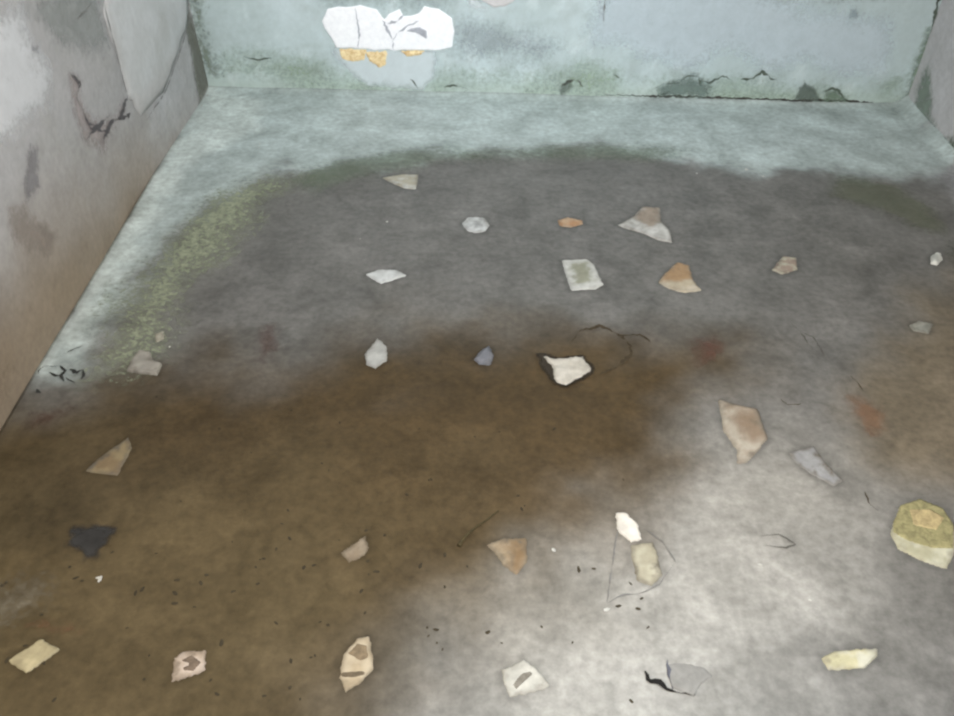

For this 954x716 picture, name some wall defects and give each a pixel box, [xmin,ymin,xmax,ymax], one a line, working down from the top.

flaking render [322,5,454,68]
crack [71,73,130,142]
water stain [661,79,709,97]
water stain [25,151,38,197]
crack [571,324,650,375]
spalling [68,525,116,557]